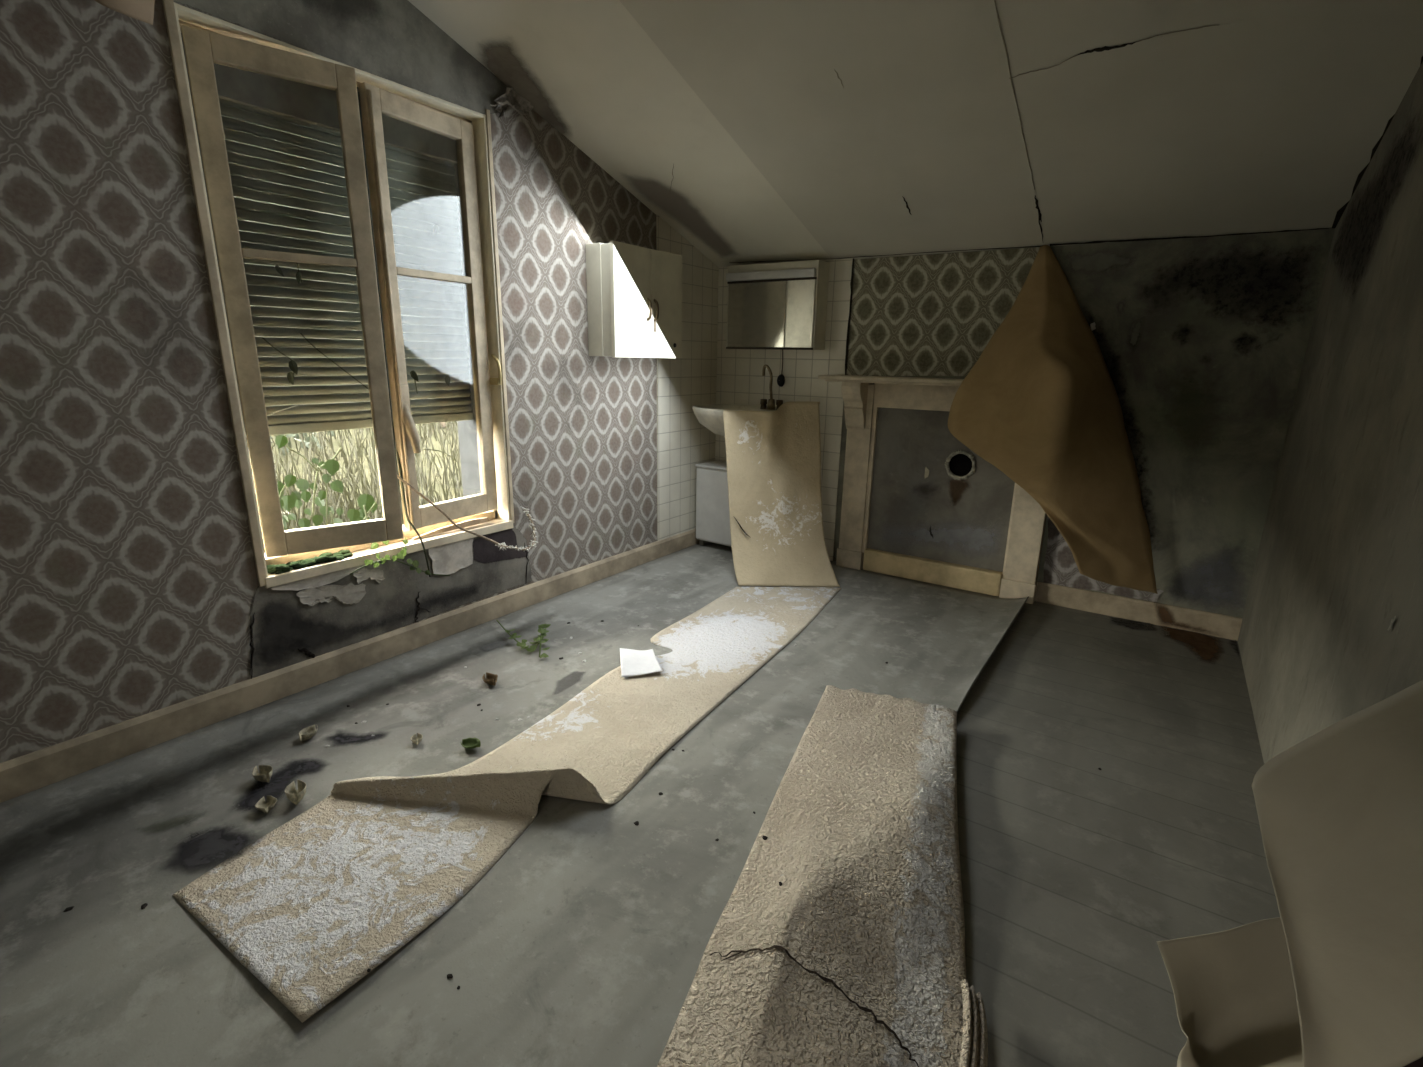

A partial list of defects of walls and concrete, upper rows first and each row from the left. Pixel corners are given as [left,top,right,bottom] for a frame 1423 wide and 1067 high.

crack [729,0,1395,263]
peeling [948,245,1158,594]
flaking render [249,525,532,677]
peeling [1252,680,1423,1067]